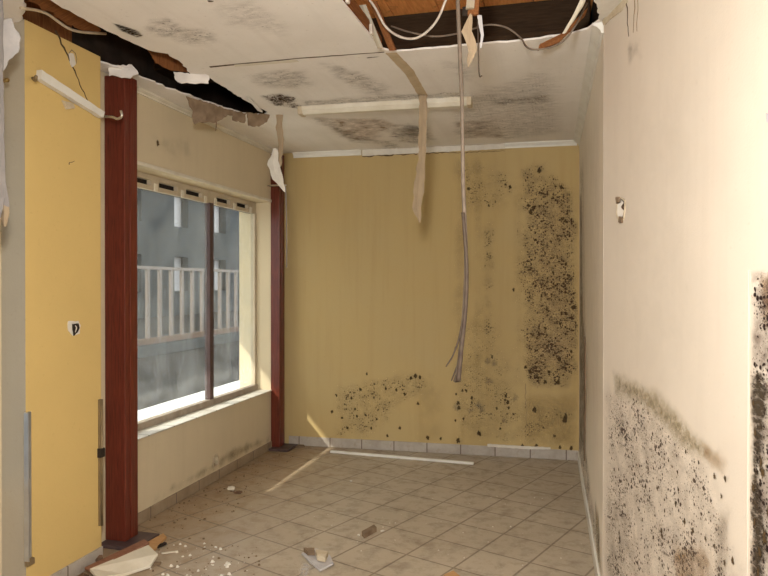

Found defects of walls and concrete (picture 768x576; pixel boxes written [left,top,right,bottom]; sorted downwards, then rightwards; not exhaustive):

flaking render [594,0,628,25]
crack [626,0,638,37]
crack [55,30,88,100]
leakage [263,72,298,108]
leakage [454,166,734,576]
leakage [331,374,426,435]
leakage [750,278,768,576]